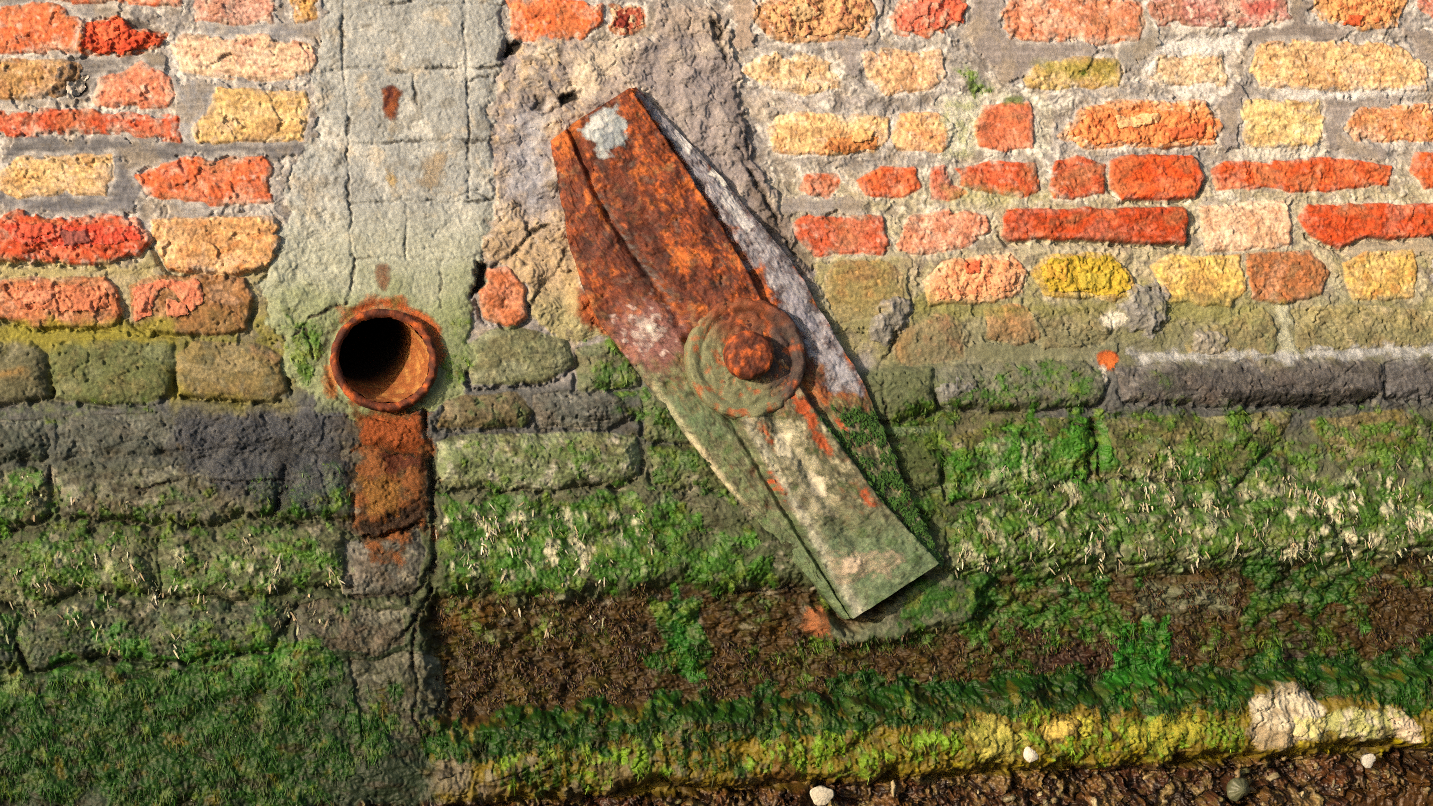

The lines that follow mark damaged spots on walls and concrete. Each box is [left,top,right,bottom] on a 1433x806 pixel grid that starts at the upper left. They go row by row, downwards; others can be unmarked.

rust [345,265,446,362]
rust [578,289,607,334]
water stain [1126,306,1433,408]
water stain [174,408,342,510]
rust [327,367,436,564]
rust [803,607,830,637]
water stain [1041,716,1093,740]
water stain [1249,683,1422,750]